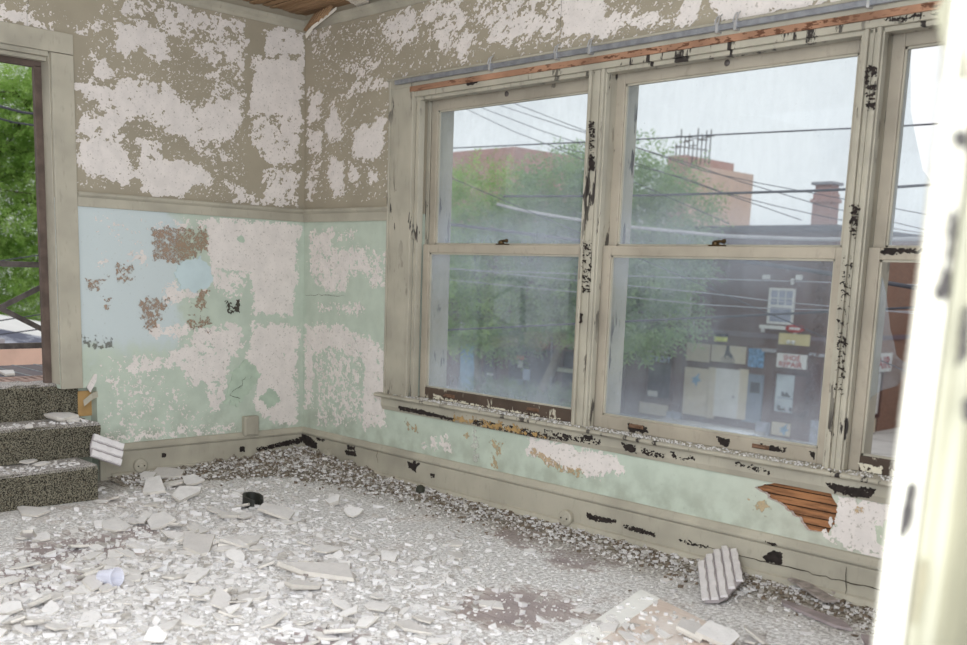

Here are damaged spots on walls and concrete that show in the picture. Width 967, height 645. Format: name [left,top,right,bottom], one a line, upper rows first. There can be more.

peeling [885,0,953,80]
peeling [0,0,841,207]
peeling [864,65,877,111]
peeling [849,204,860,239]
peeling [934,208,956,301]
peeling [93,213,387,452]
peeling [834,258,853,395]
peeling [955,306,967,366]
peeling [398,406,455,421]
peeling [433,394,695,481]
peeling [763,541,783,565]
peeling [735,462,917,558]